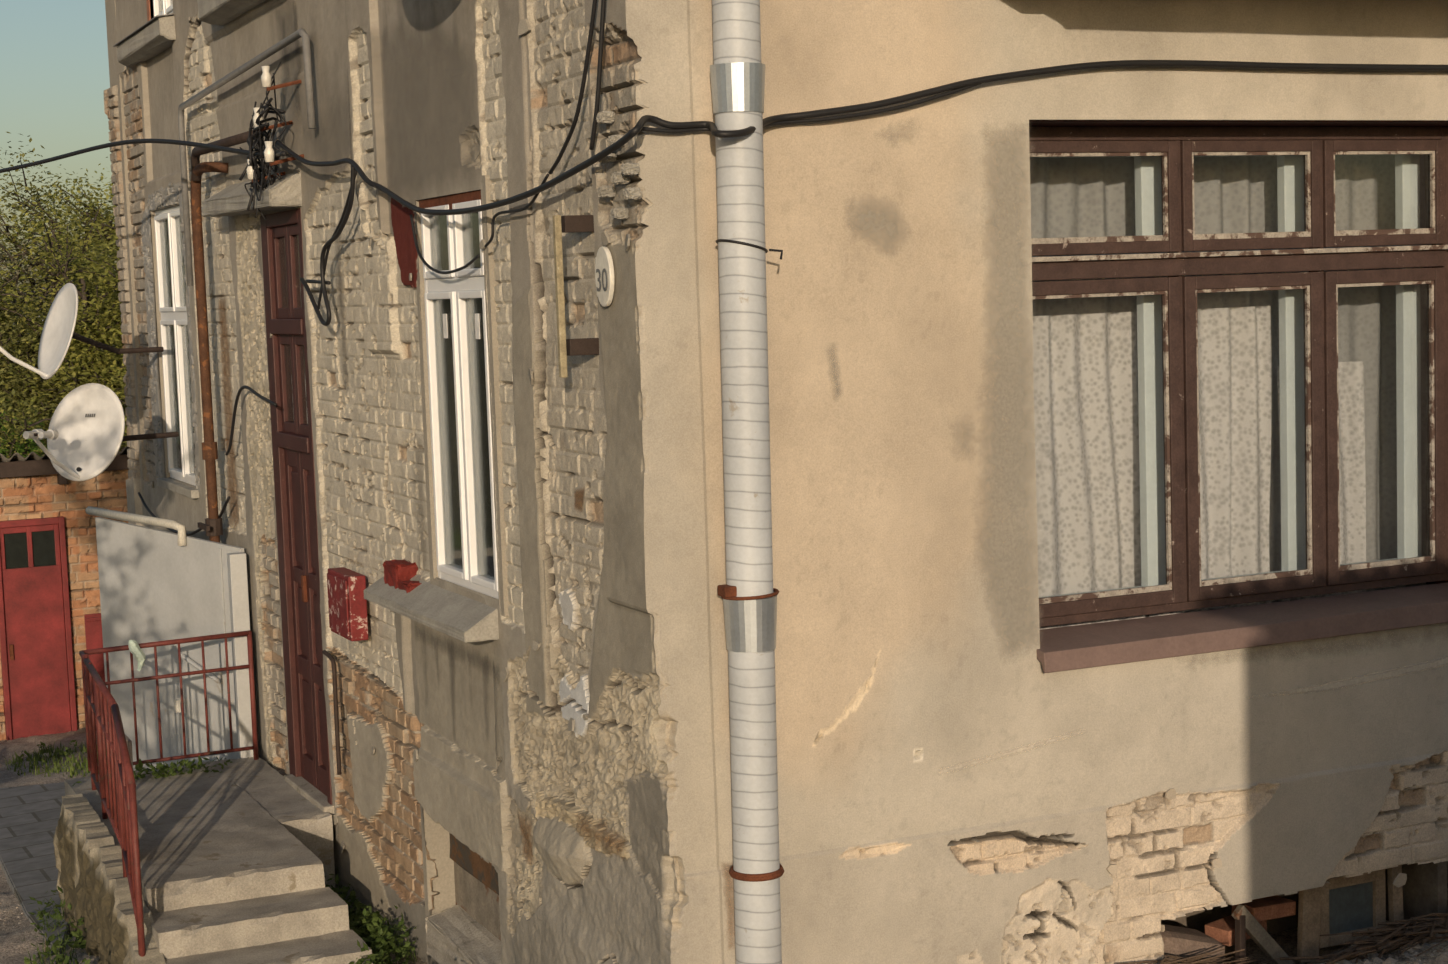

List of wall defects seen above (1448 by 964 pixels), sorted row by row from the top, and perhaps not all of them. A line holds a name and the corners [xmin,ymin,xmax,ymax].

corrosion [220,304,237,516]
crack [334,307,346,419]
flaking render [303,25,440,912]
crack [374,343,407,549]
flaking render [459,0,678,936]
crack [518,136,652,782]
spalling [660,832,689,931]
flaking render [840,841,913,859]
flaking render [950,781,1281,964]
flaking render [1326,749,1448,888]